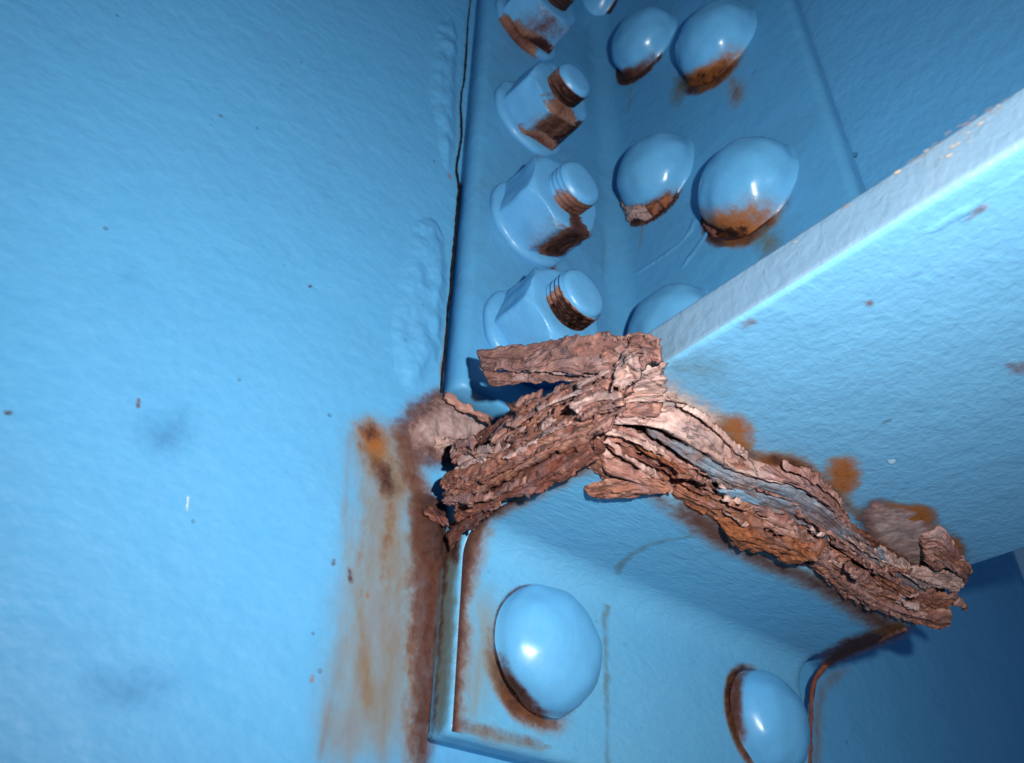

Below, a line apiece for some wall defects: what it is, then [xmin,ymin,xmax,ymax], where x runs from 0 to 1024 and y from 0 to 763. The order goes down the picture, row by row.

corrosion [499,0,575,58]
corrosion [615,53,662,86]
corrosion [675,54,737,97]
corrosion [518,68,588,151]
crack [440,0,471,393]
corrosion [538,186,595,270]
corrosion [630,190,679,227]
corrosion [700,204,776,251]
corrosion [359,285,973,763]